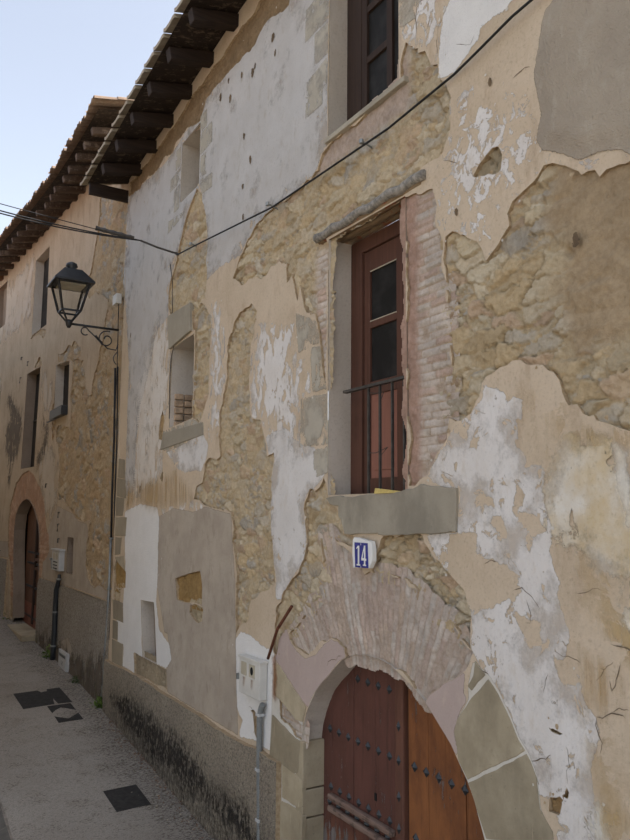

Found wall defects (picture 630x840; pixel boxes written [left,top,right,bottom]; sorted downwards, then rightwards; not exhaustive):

peeling [115,504,173,688]
peeling [9,0,513,622]
flaking render [167,164,630,840]
peeling [446,105,536,216]